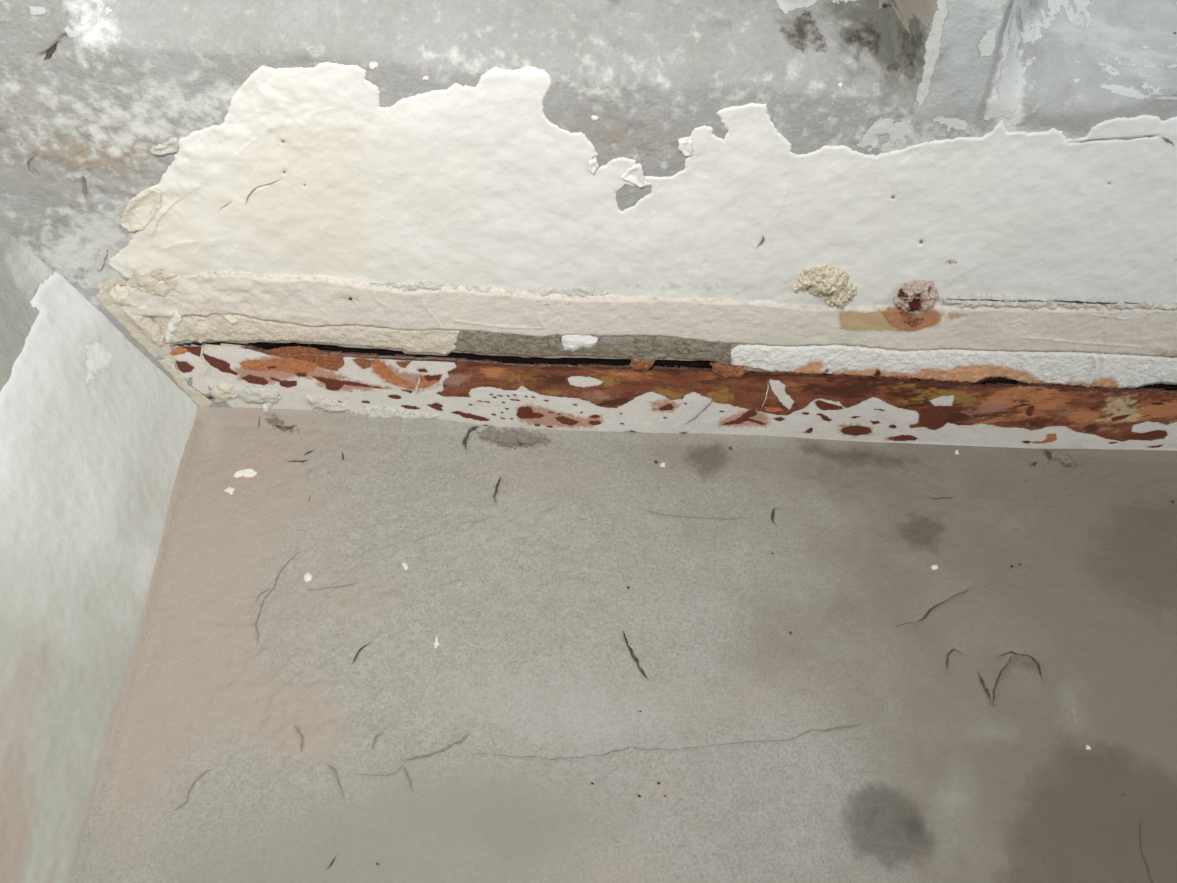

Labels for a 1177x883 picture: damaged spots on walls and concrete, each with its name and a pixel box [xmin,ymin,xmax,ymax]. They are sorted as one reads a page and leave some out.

peeling [776,0,859,14]
peeling [876,0,949,107]
peeling [977,0,1093,120]
peeling [1096,54,1177,106]
peeling [857,116,971,153]
peeling [621,163,651,188]
rust [170,345,1177,448]
crack [898,588,969,626]
crack [623,631,648,679]
crack [946,649,1042,701]
crack [294,724,304,752]
crack [327,724,860,797]